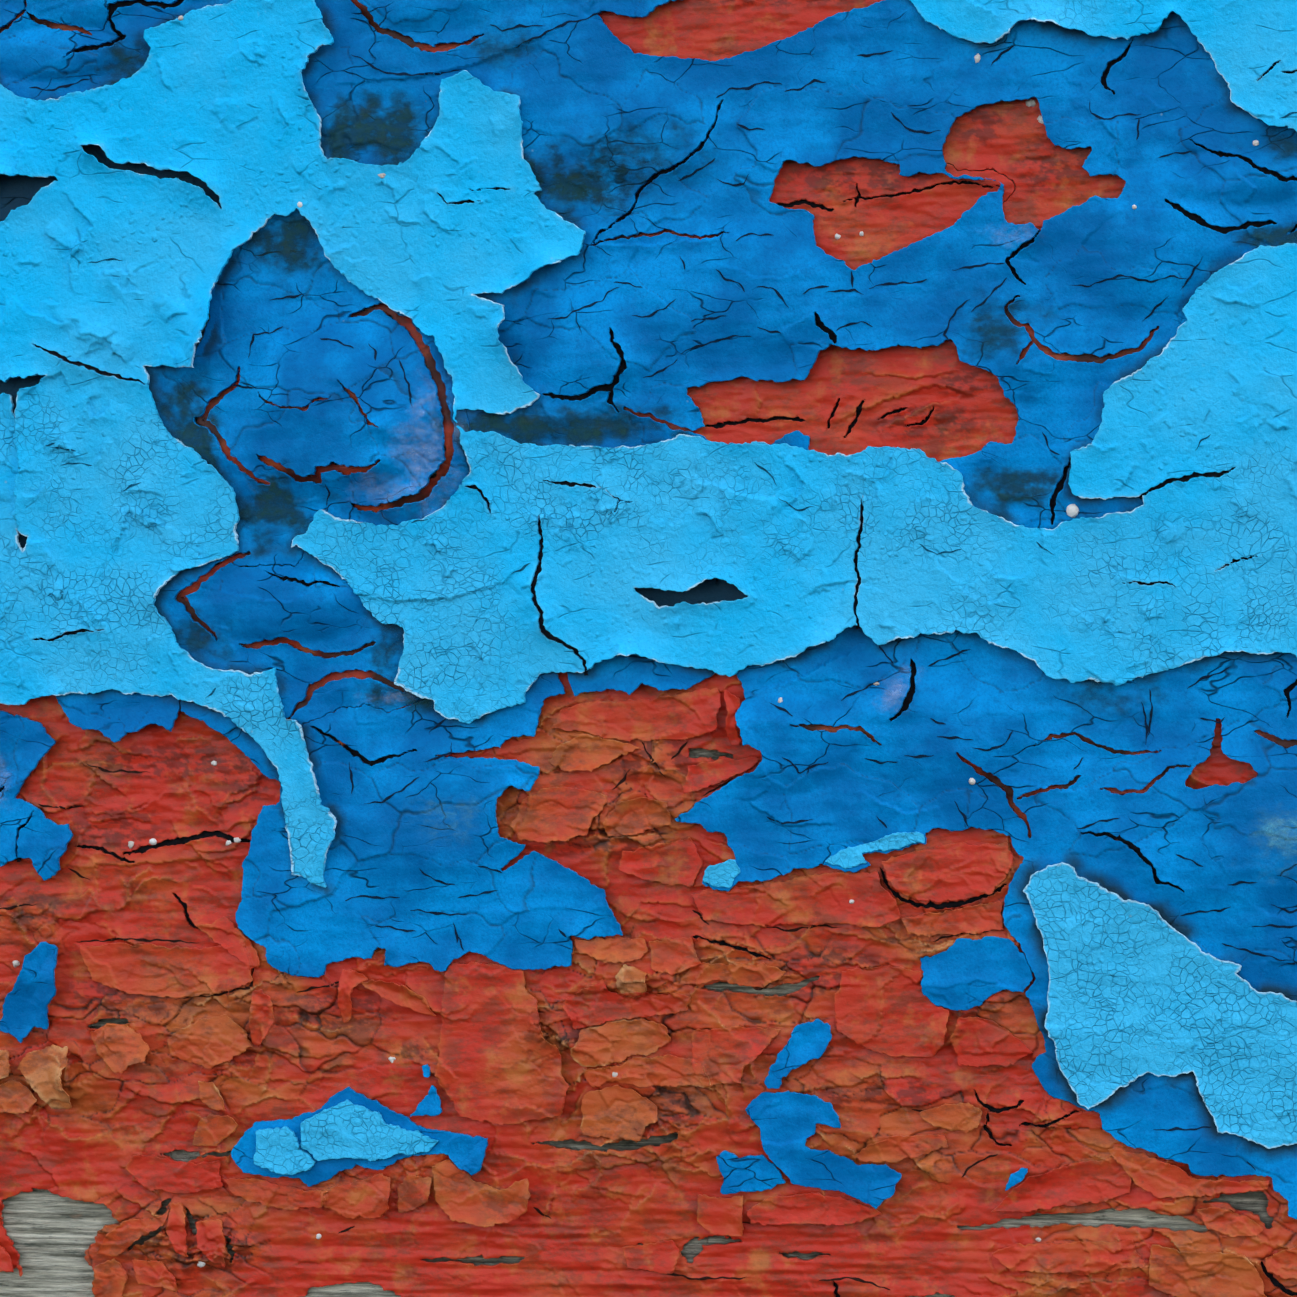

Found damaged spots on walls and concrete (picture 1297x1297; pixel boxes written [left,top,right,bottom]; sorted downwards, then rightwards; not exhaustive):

peeling [0,0,233,101]
peeling [145,0,1297,726]
crack [544,480,630,512]
crack [511,517,588,676]
crack [767,503,1297,966]
peeling [1185,718,1258,789]
peeling [0,688,1033,1297]
peeling [957,1147,1297,1297]